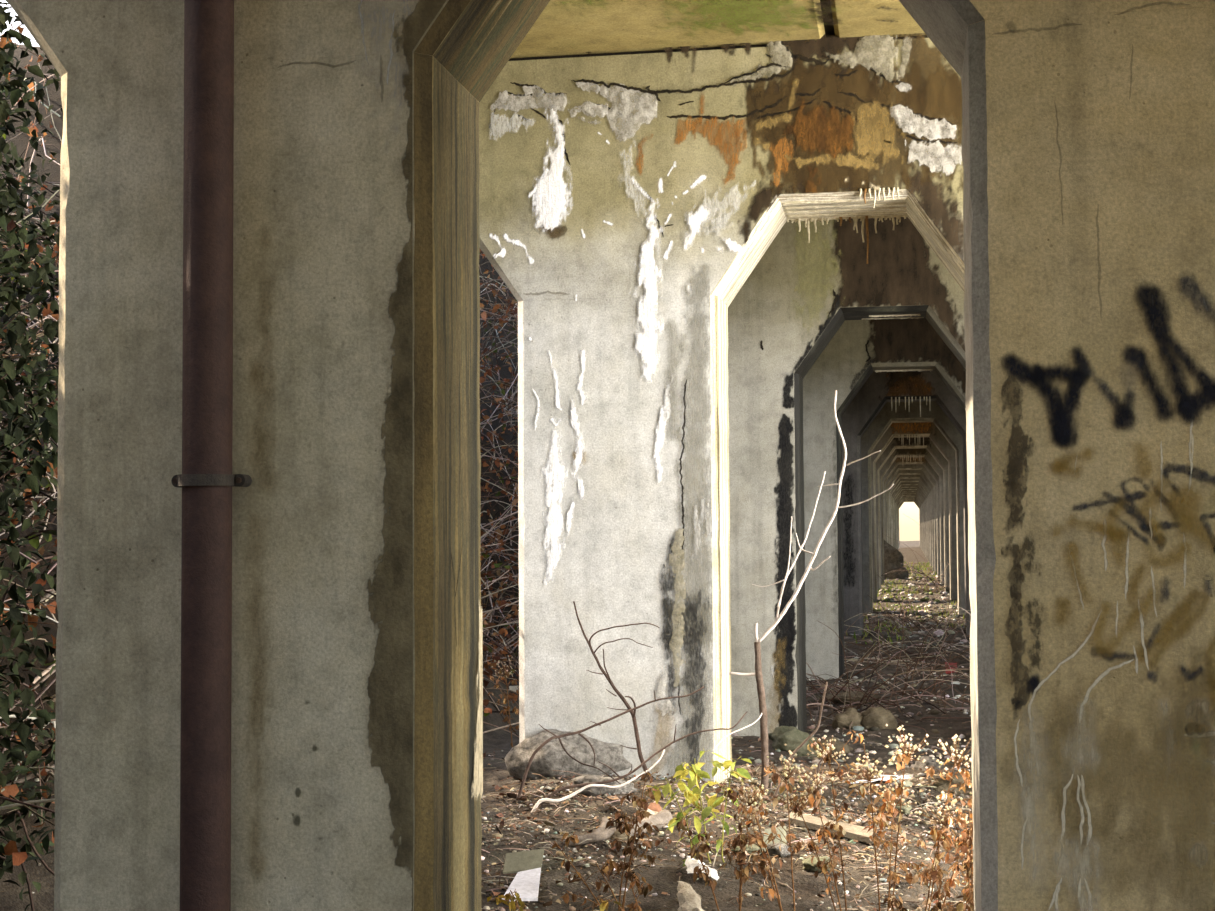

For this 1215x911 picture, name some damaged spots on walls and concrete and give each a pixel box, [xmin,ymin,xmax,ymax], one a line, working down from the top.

damp [529,105,585,239]
spalling [490,82,658,141]
crack [489,41,958,164]
spalling [730,41,793,86]
corrosion [675,80,904,193]
spalling [830,35,912,82]
damp [490,233,534,264]
damp [622,0,966,783]
damp [533,349,586,585]
damp [1001,376,1157,911]